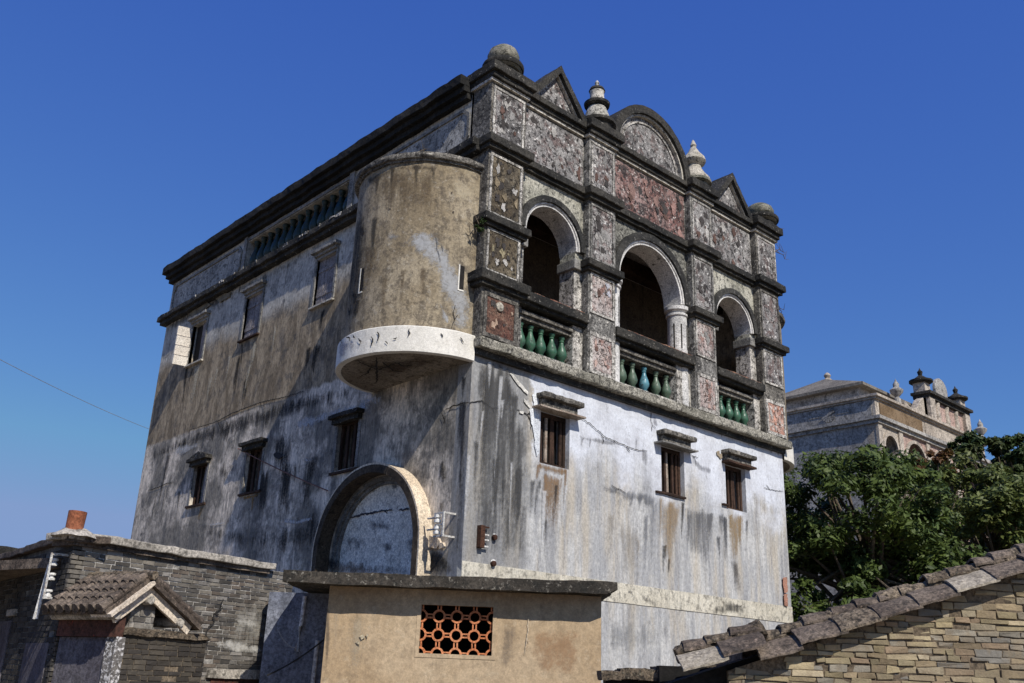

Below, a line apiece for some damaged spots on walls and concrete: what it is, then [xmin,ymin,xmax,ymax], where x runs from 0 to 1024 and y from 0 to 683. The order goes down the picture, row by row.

leakage [348,215,377,315]
leakage [153,390,379,496]
crack [442,400,532,426]
leakage [457,362,566,548]
crack [583,413,656,451]
leakage [208,435,318,549]
crack [350,508,409,518]
leakage [681,503,727,556]
crack [206,599,224,644]